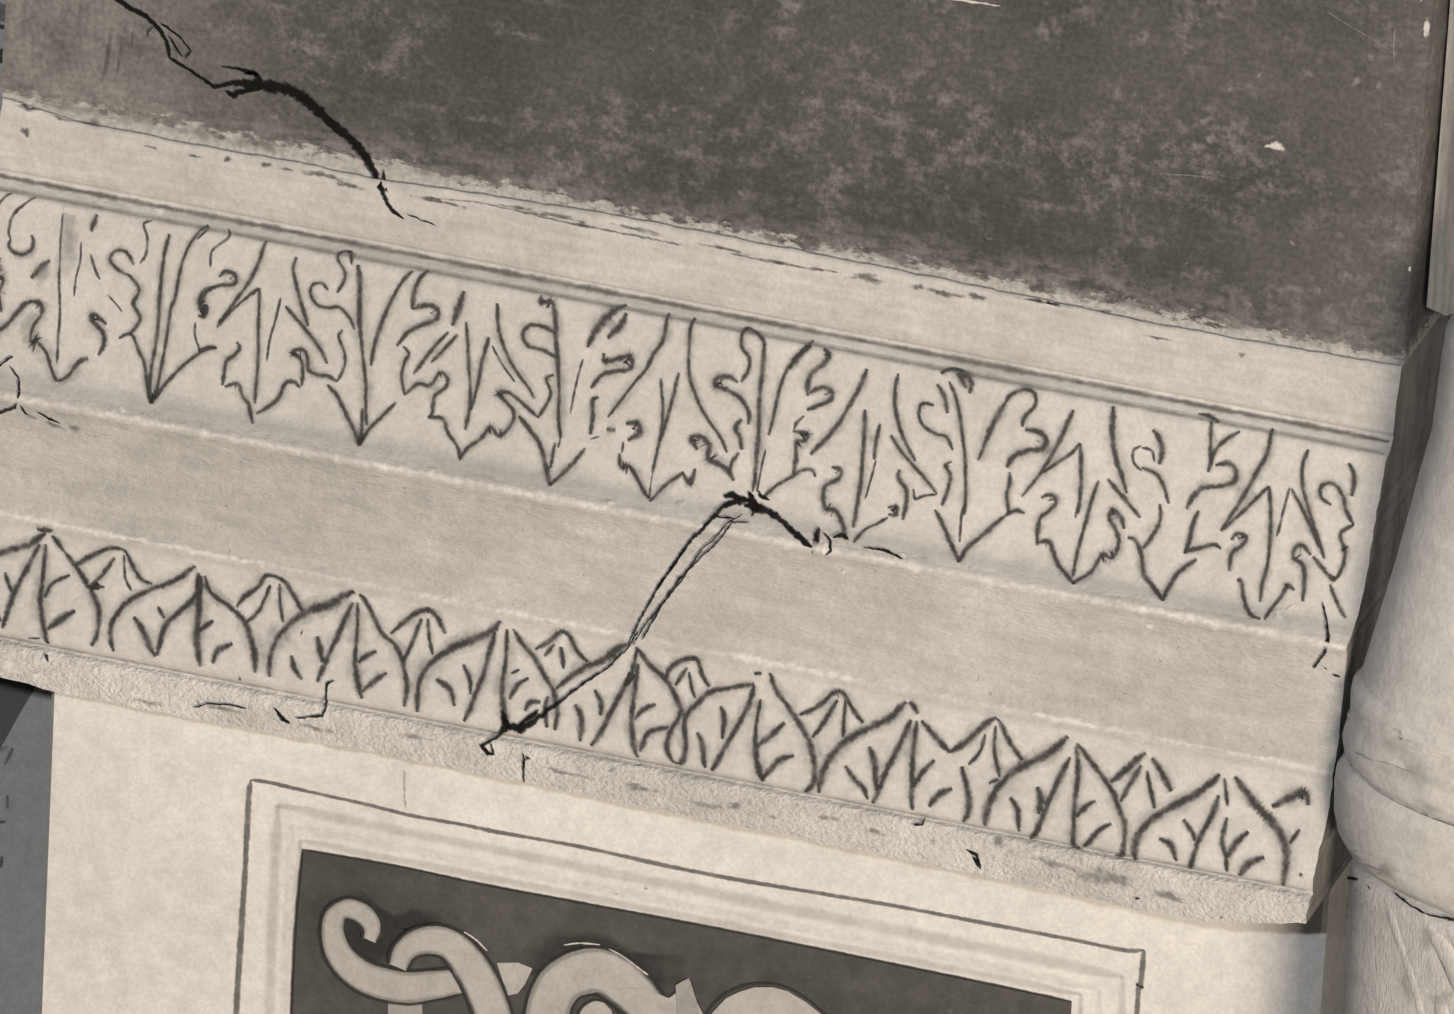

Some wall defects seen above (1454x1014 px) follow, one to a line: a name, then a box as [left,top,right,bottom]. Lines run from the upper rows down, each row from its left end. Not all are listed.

crack [115,0,436,226]
crack [0,356,60,424]
crack [480,490,902,783]